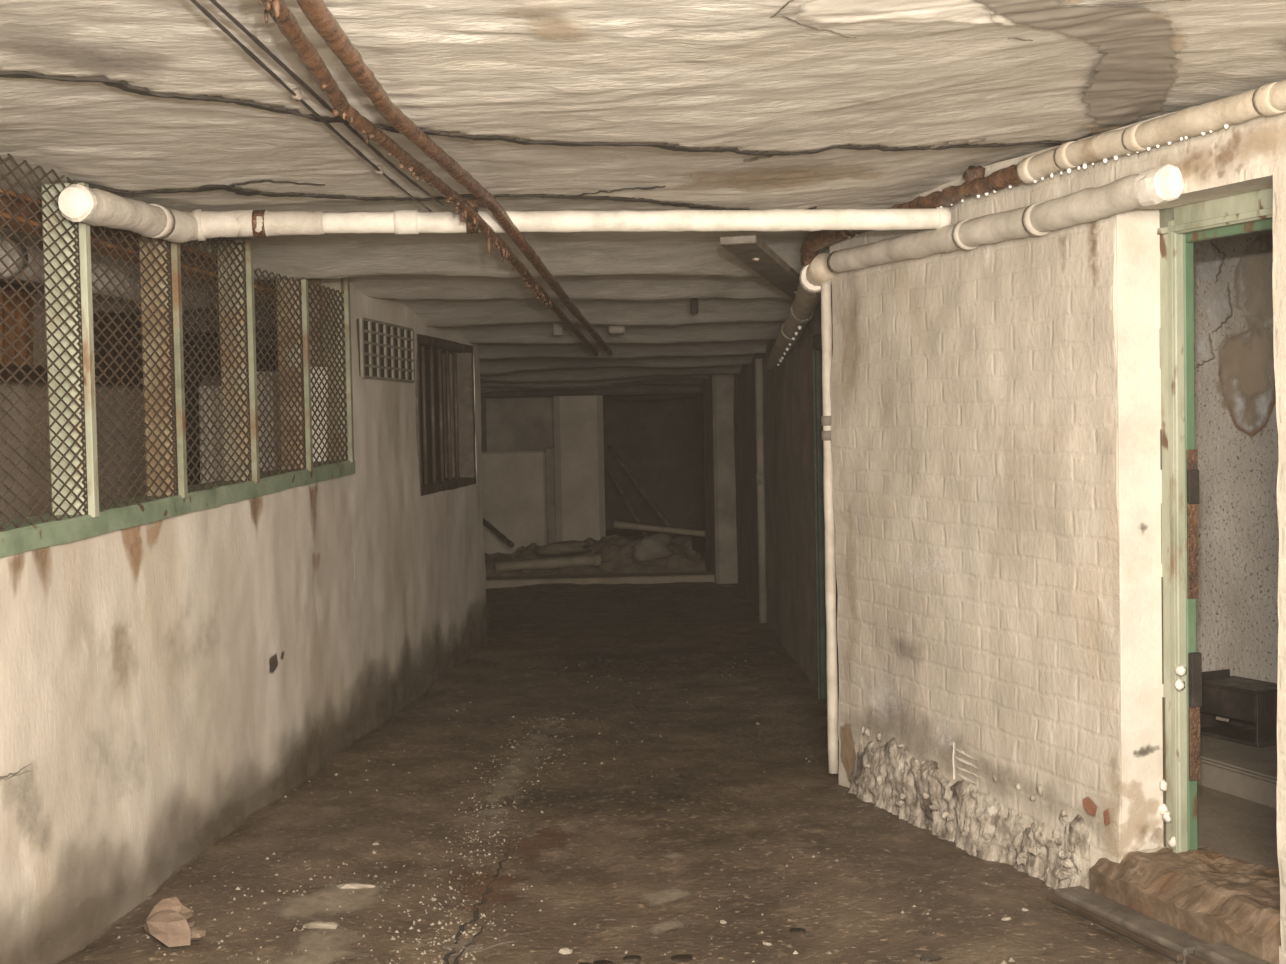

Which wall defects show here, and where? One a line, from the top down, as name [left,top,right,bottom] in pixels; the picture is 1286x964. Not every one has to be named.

spalling [770,0,1033,41]
leakage [976,0,1180,125]
crack [0,71,1095,162]
spalling [1088,126,1124,134]
crack [89,180,749,210]
leakage [1219,236,1276,437]
rust [13,549,48,572]
rust [122,521,162,569]
rust [1186,449,1199,599]
rust [1188,707,1201,781]
spalling [840,725,1110,890]
crack [443,849,514,964]